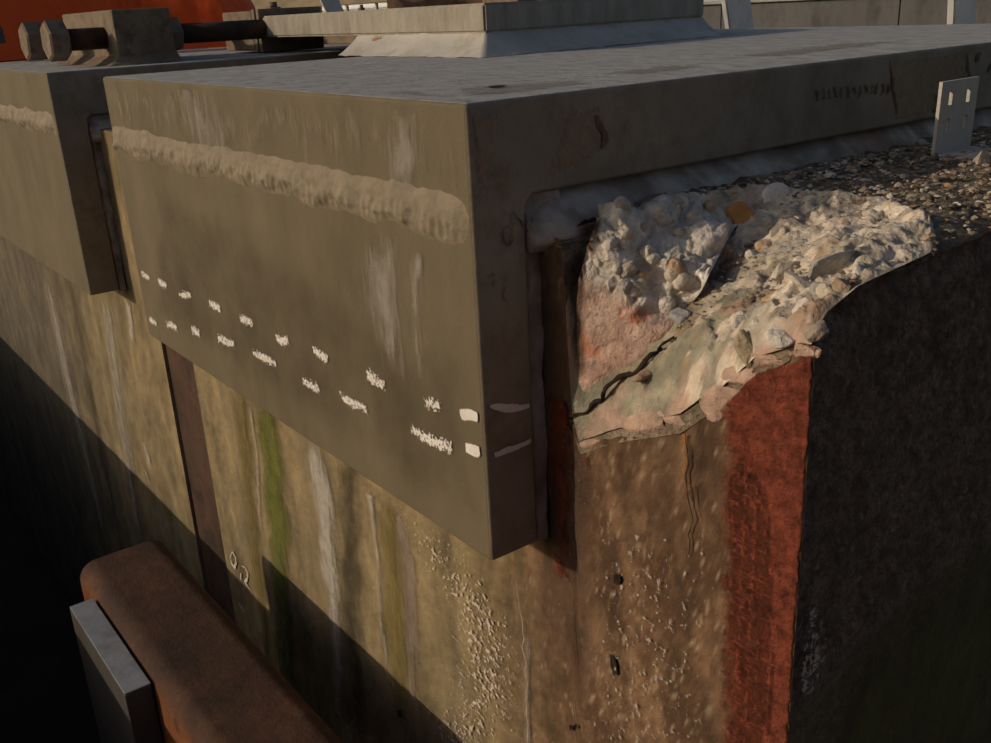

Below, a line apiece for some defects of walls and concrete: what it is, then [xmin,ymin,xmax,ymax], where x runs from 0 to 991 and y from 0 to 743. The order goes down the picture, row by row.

crack [569,336,675,424]
spalling [565,182,936,448]
water stain [240,397,293,680]
water stain [310,450,361,736]
rust [719,356,812,743]